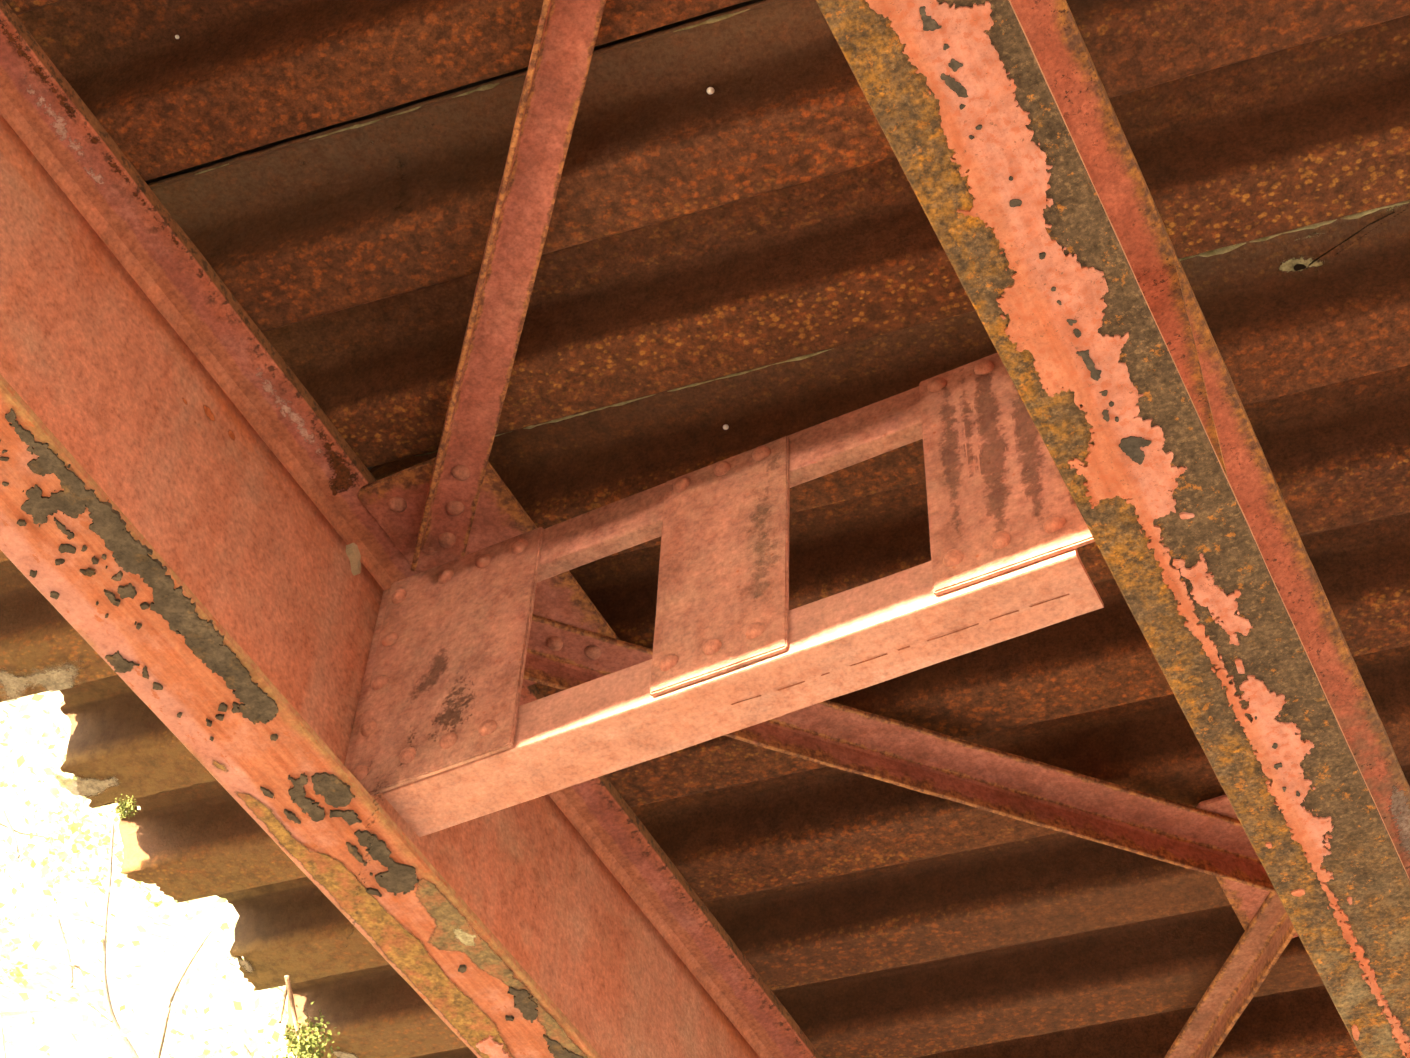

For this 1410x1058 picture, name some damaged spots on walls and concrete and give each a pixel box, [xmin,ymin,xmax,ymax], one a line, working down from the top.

peeling [256,367,324,455]
peeling [0,408,278,741]
peeling [866,0,1410,1058]
peeling [260,772,419,897]
peeling [476,1035,512,1058]
peeling [505,986,584,1058]